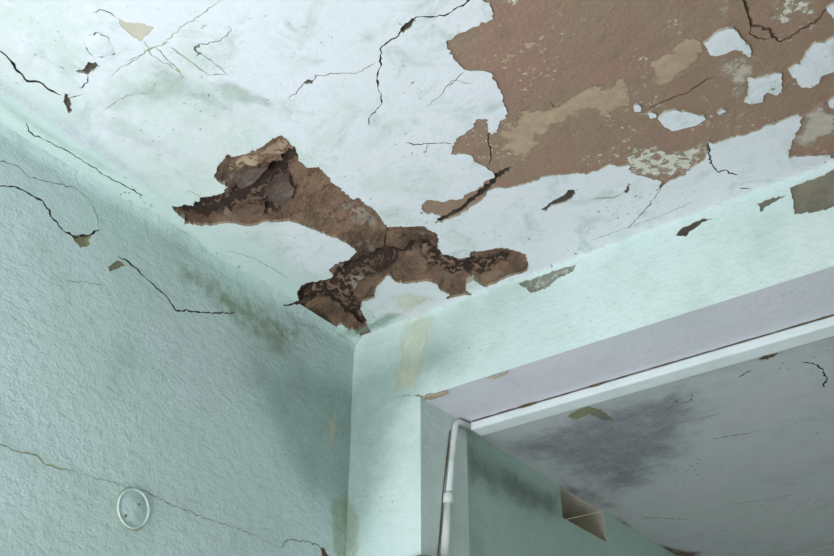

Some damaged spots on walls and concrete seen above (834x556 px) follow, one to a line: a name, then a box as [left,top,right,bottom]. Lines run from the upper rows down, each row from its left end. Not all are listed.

crack [0,51,88,98]
crack [106,0,231,109]
crack [289,0,470,125]
crack [0,161,100,238]
peeling [171,0,834,337]
crack [117,256,235,314]
crack [804,362,828,387]
crack [0,444,327,556]